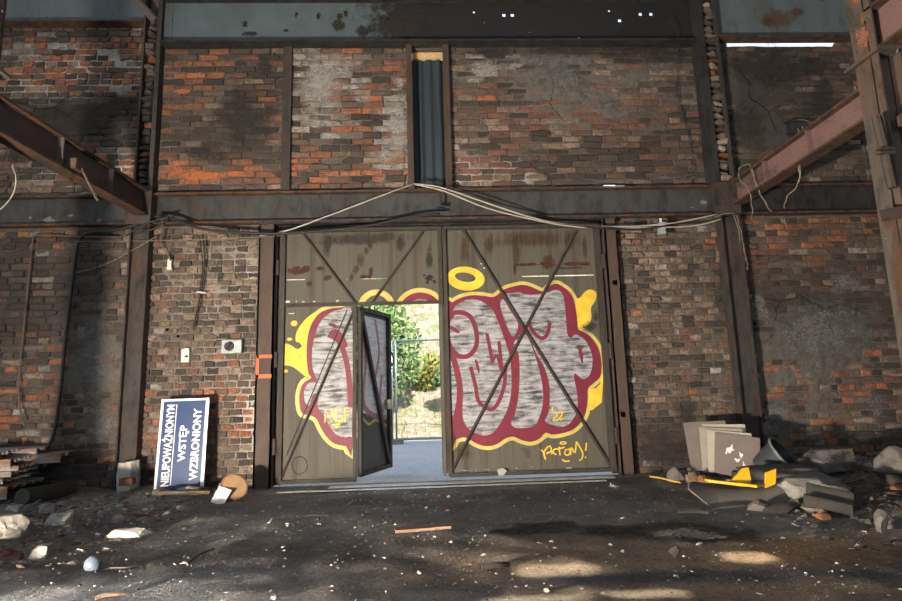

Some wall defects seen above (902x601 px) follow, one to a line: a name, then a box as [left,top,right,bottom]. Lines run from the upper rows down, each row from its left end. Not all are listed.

corrosion [849,0,869,56]
water stain [185,146,225,162]
water stain [490,518,759,543]